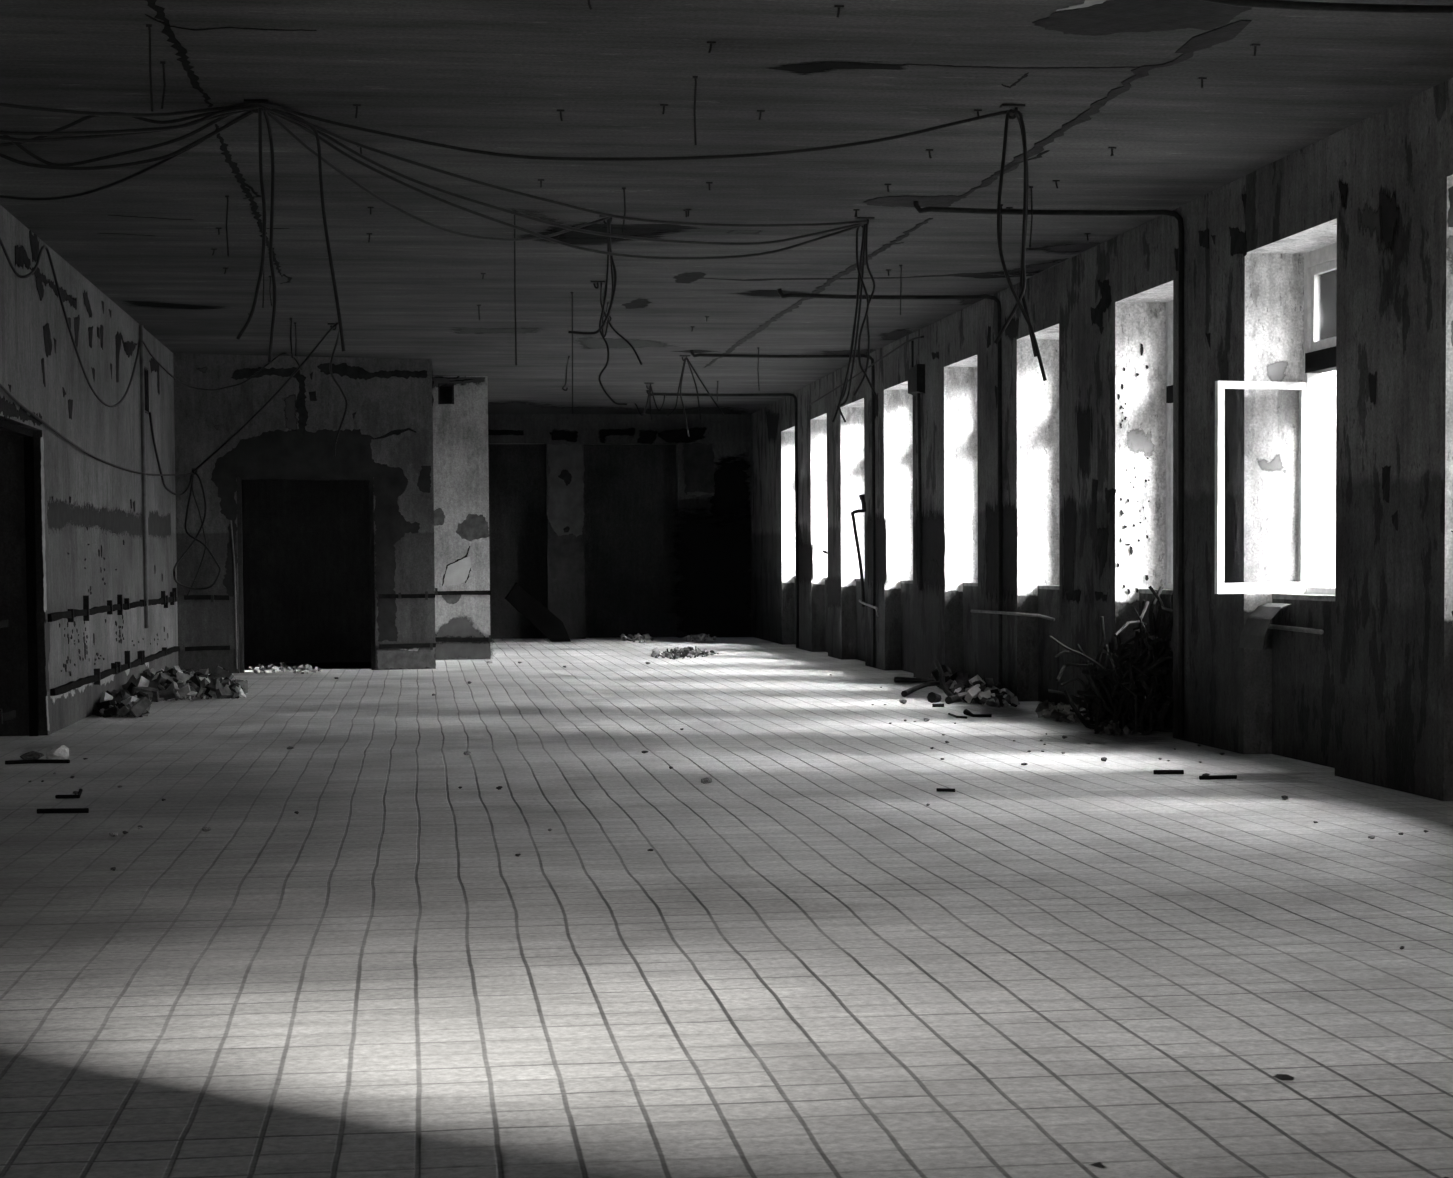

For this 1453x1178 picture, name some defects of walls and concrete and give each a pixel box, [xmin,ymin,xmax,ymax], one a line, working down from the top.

spalling [1032,0,1253,36]
crack [145,0,317,284]
crack [703,20,1252,368]
peeling [41,323,73,419]
peeling [67,290,138,383]
peeling [0,384,171,731]
flaking render [211,429,489,642]